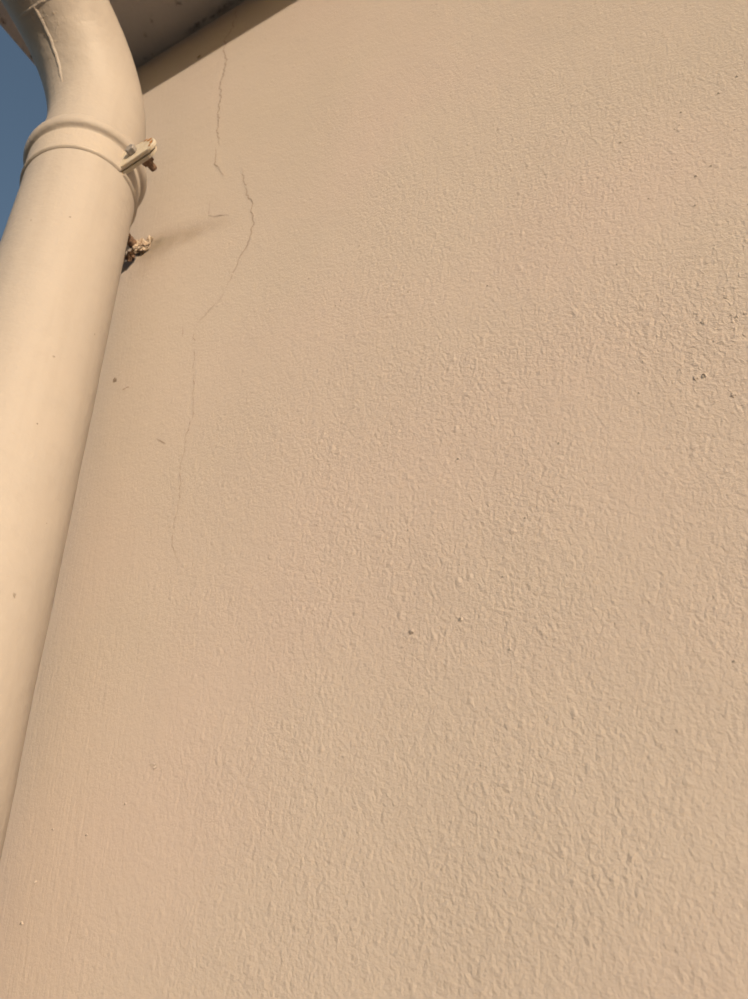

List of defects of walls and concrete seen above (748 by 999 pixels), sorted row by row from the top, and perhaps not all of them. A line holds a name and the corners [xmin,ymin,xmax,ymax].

crack [172,2,255,559]